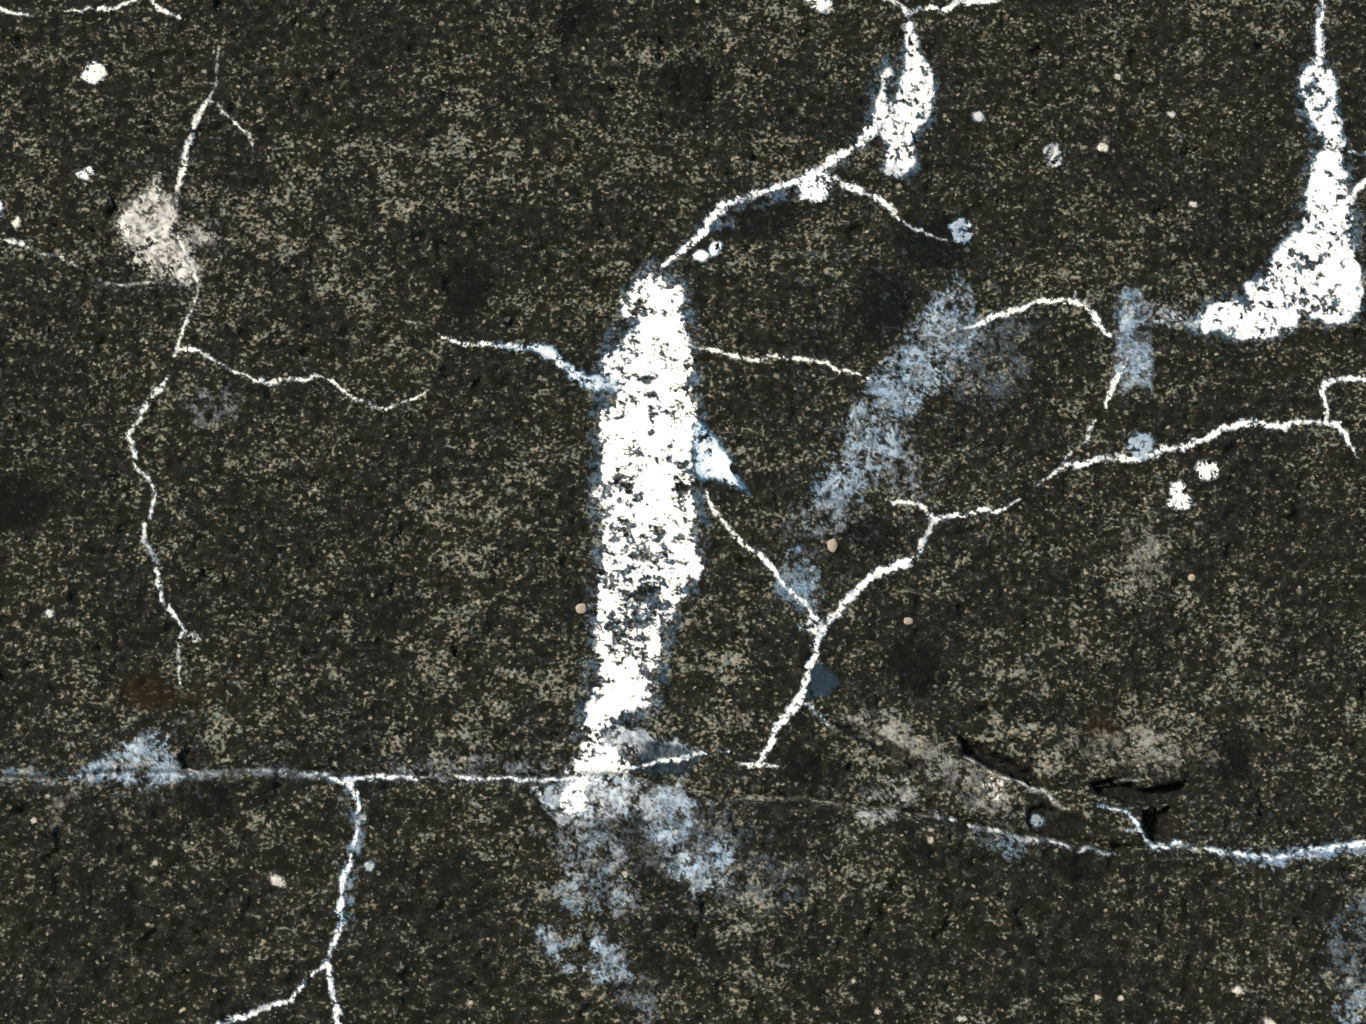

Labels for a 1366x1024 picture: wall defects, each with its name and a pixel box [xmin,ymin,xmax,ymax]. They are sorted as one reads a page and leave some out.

crack [0,6,28,16]
crack [5,239,75,266]
crack [68,0,181,19]
crack [175,99,254,201]
crack [661,0,999,267]
crack [1195,0,1366,340]
crack [126,236,426,684]
damp [532,266,743,892]
crack [216,293,1366,1024]
damp [537,928,625,982]